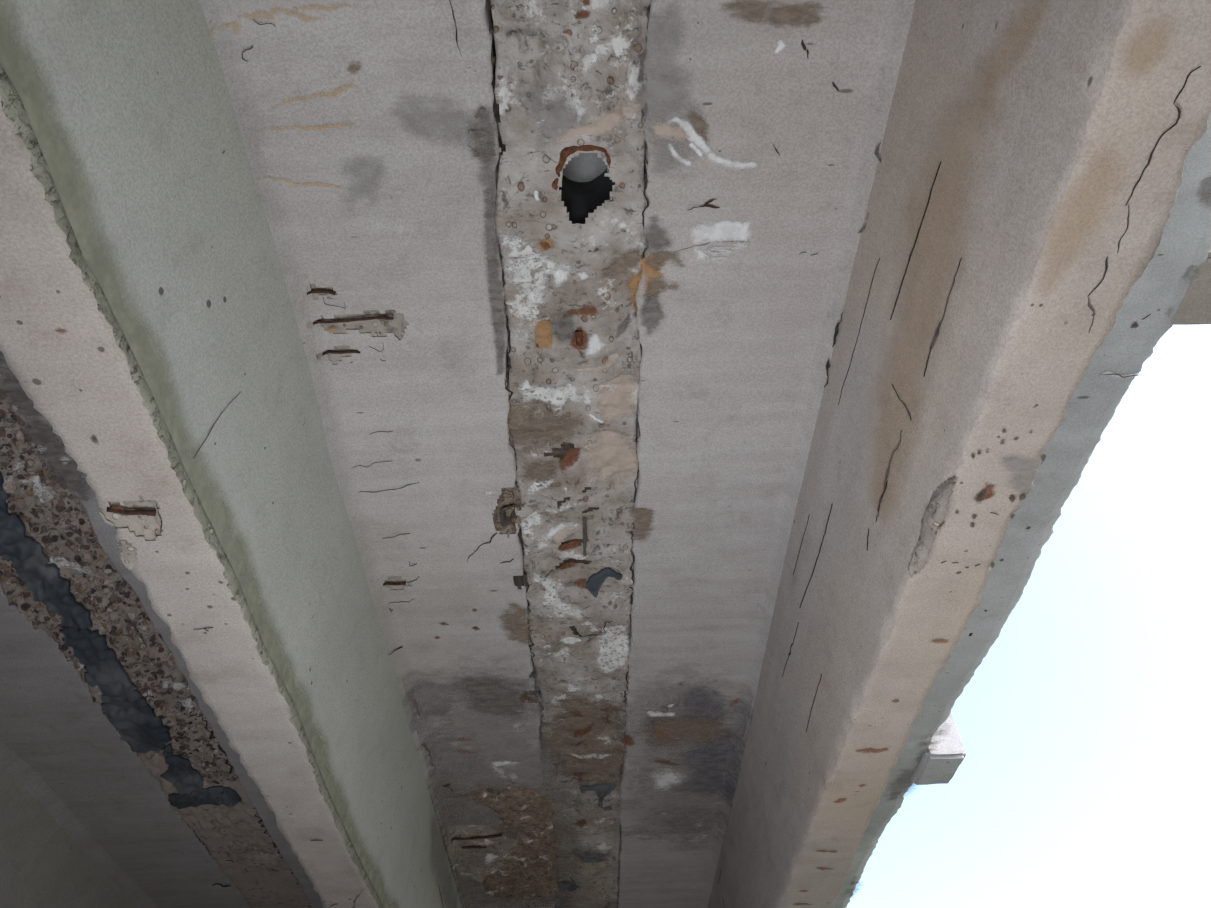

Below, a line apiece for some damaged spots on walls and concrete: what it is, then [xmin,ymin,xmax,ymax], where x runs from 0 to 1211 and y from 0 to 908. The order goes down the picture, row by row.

crack [487,0,506,159]
corrosion [564,306,597,317]
corrosion [604,220,683,335]
efflorescence [676,221,751,260]
crack [824,162,941,405]
crack [1087,66,1201,332]
corrosion [559,448,580,470]
spalling [99,496,163,570]
spalling [467,484,522,561]
crack [502,271,587,783]
spalling [907,478,977,578]
damp [407,676,753,908]